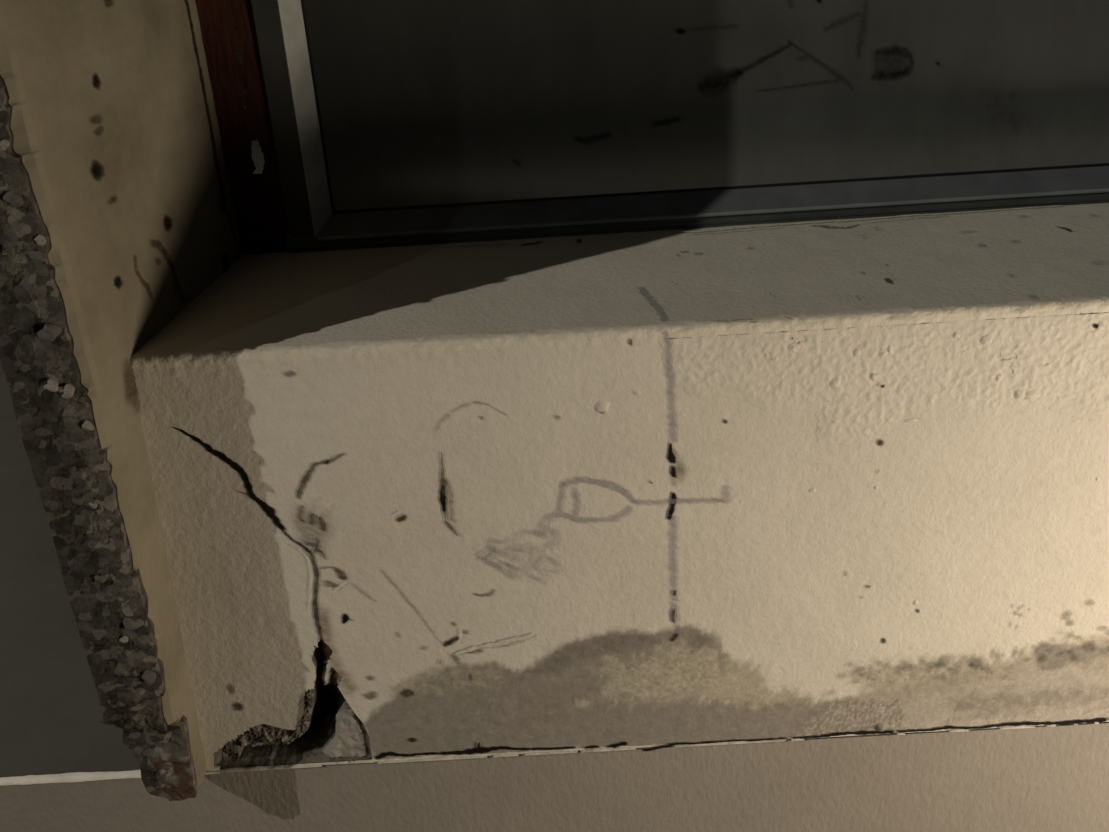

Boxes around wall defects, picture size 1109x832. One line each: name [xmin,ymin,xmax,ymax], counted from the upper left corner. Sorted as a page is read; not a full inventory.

spalling [0,78,197,801]
crack [173,427,346,641]
spalling [213,640,372,769]
leakage [365,613,1109,760]
crack [375,718,1107,760]